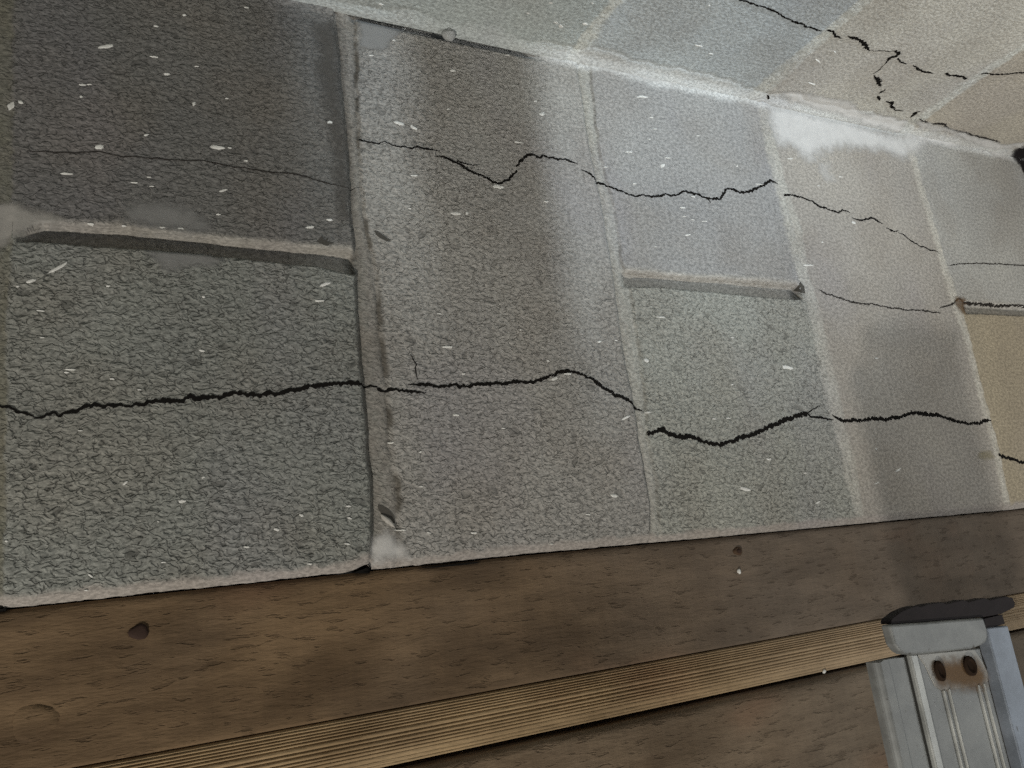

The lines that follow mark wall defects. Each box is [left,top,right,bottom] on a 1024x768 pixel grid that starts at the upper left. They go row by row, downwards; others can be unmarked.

crack [739,0,1024,143]
damp [769,106,963,161]
crack [358,139,1024,266]
crack [820,290,1024,313]
crack [0,354,992,449]
crack [999,453,1024,464]
spalling [378,505,395,528]